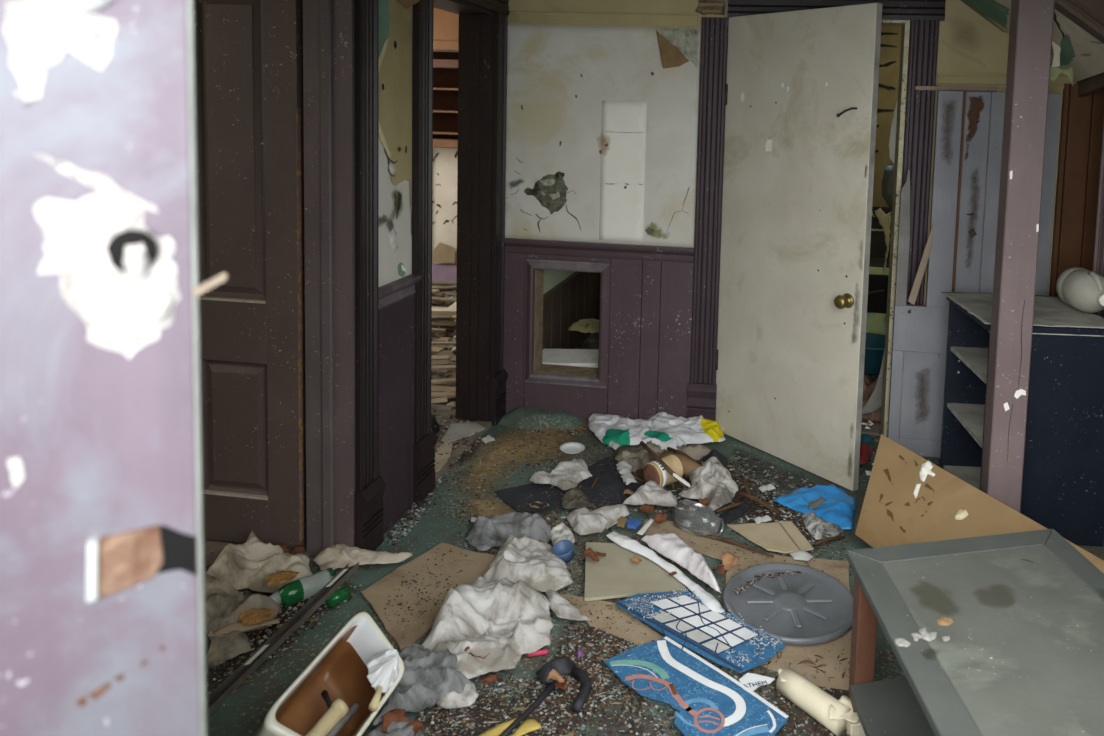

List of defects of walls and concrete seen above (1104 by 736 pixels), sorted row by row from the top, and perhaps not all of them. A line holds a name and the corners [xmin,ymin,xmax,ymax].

peeling [961,0,1010,33]
flaking render [651,28,699,75]
peeling [1050,12,1085,85]
flaking render [379,136,412,287]
spalling [520,169,582,232]
peeling [7,456,24,488]